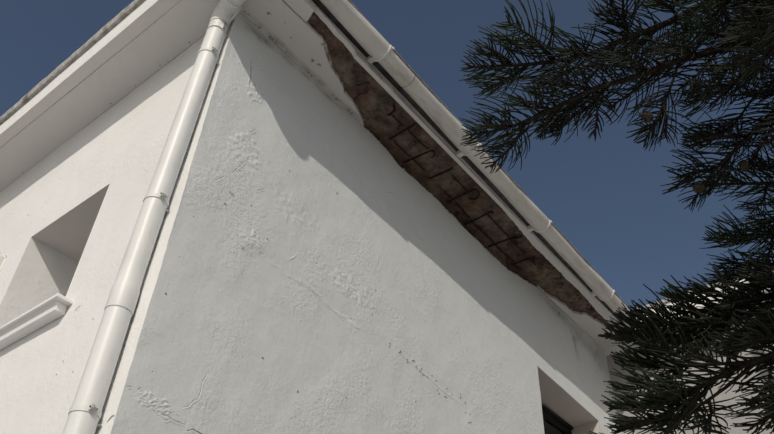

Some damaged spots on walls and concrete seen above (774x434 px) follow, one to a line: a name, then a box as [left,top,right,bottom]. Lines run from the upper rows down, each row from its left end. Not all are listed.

spalling [307,12,621,328]
crack [162,374,208,434]